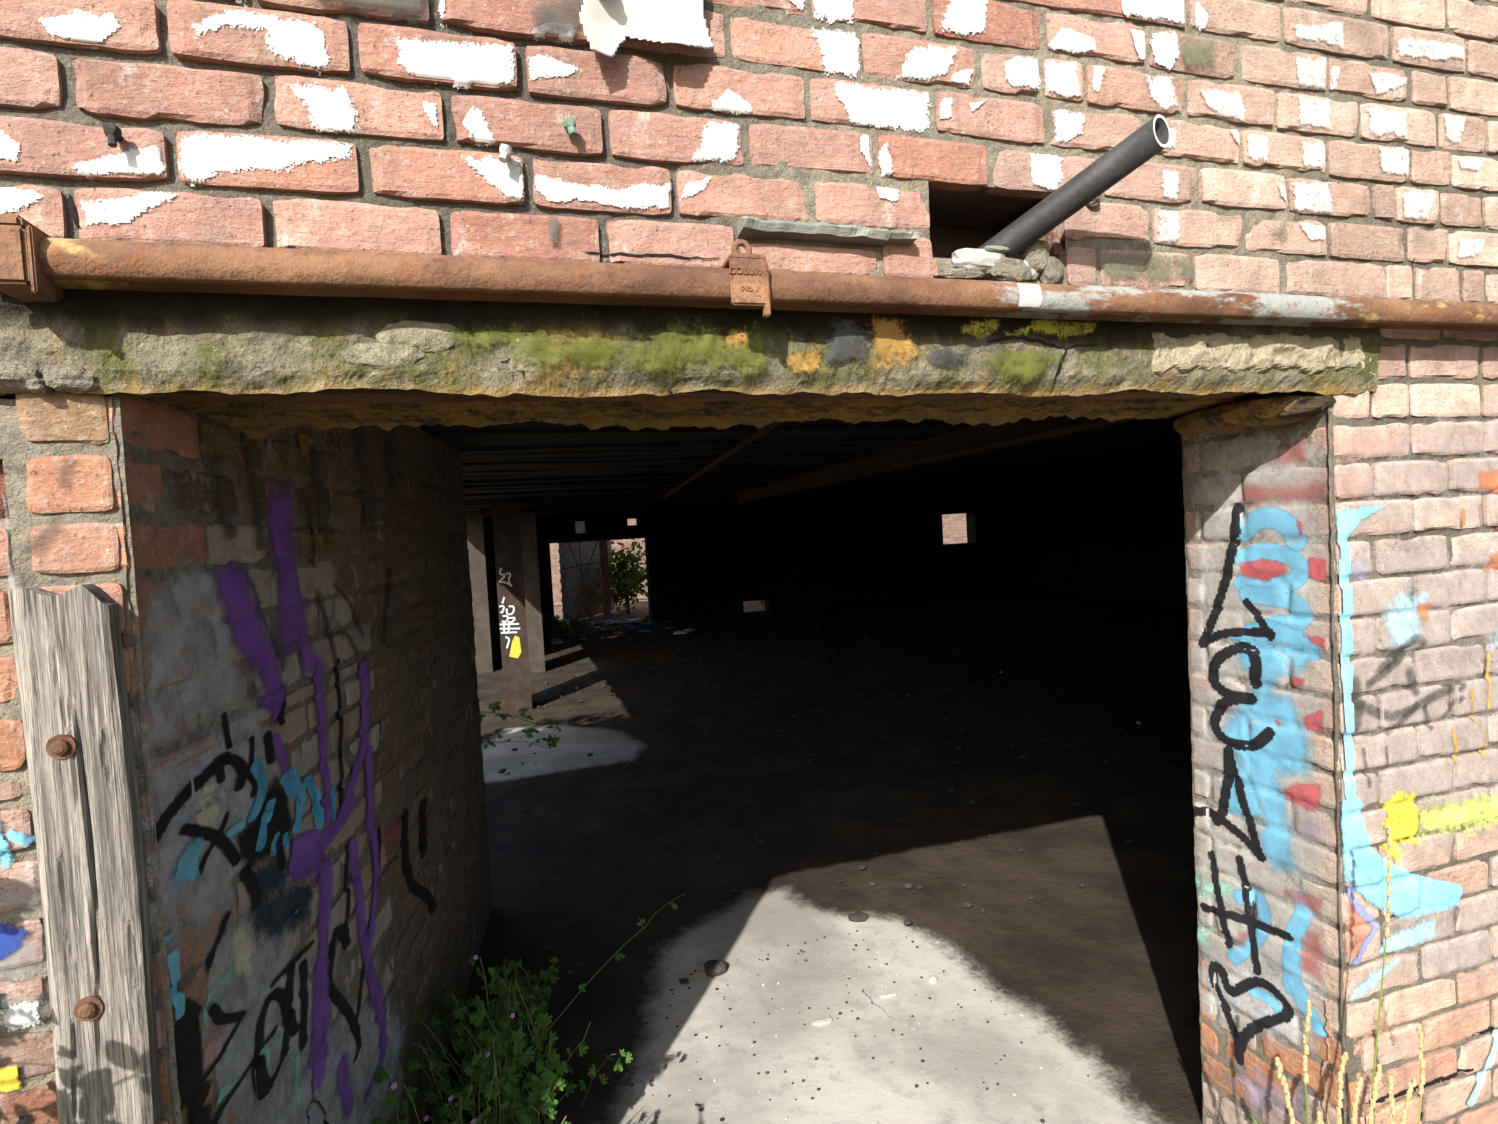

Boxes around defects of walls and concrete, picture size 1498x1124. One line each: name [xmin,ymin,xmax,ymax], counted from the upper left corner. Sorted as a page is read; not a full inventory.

corrosion [727,331,748,346]
damp [825,316,867,363]
corrosion [871,317,917,376]